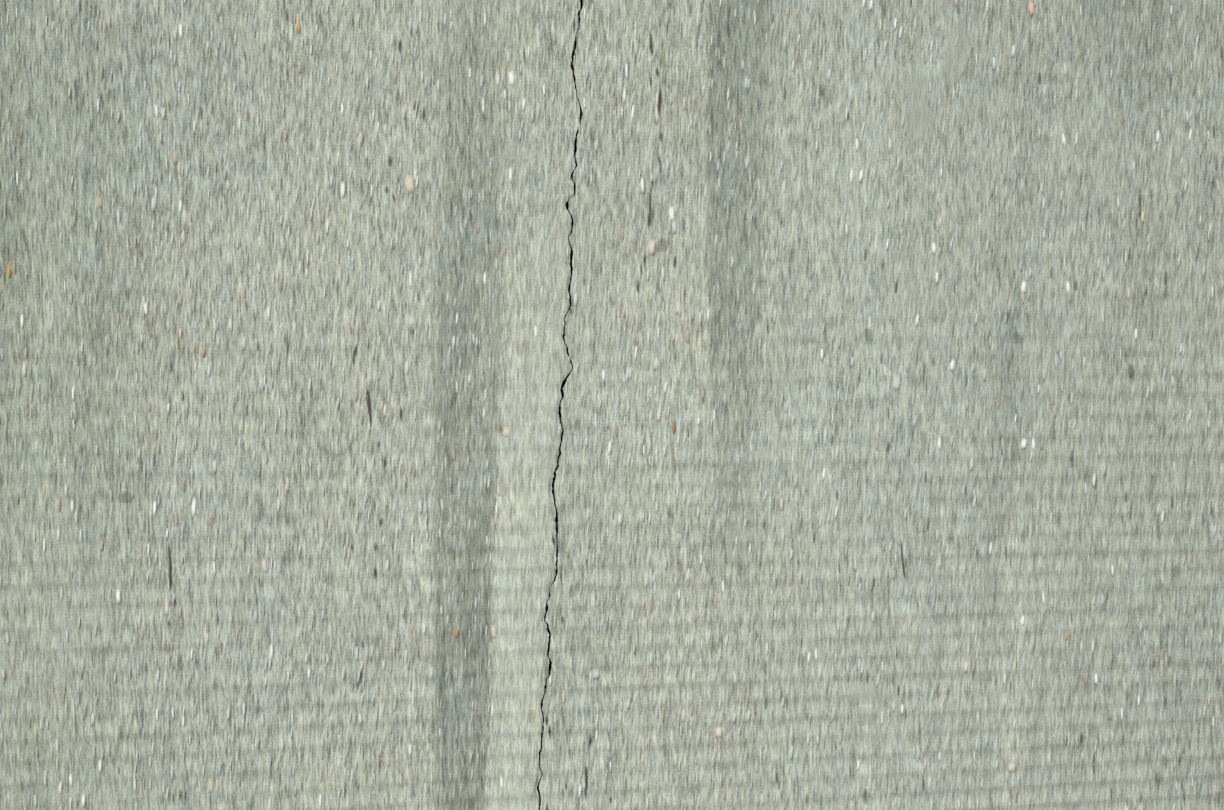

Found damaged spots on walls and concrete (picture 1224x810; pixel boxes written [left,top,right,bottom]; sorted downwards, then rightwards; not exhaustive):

crack [537,0,611,810]